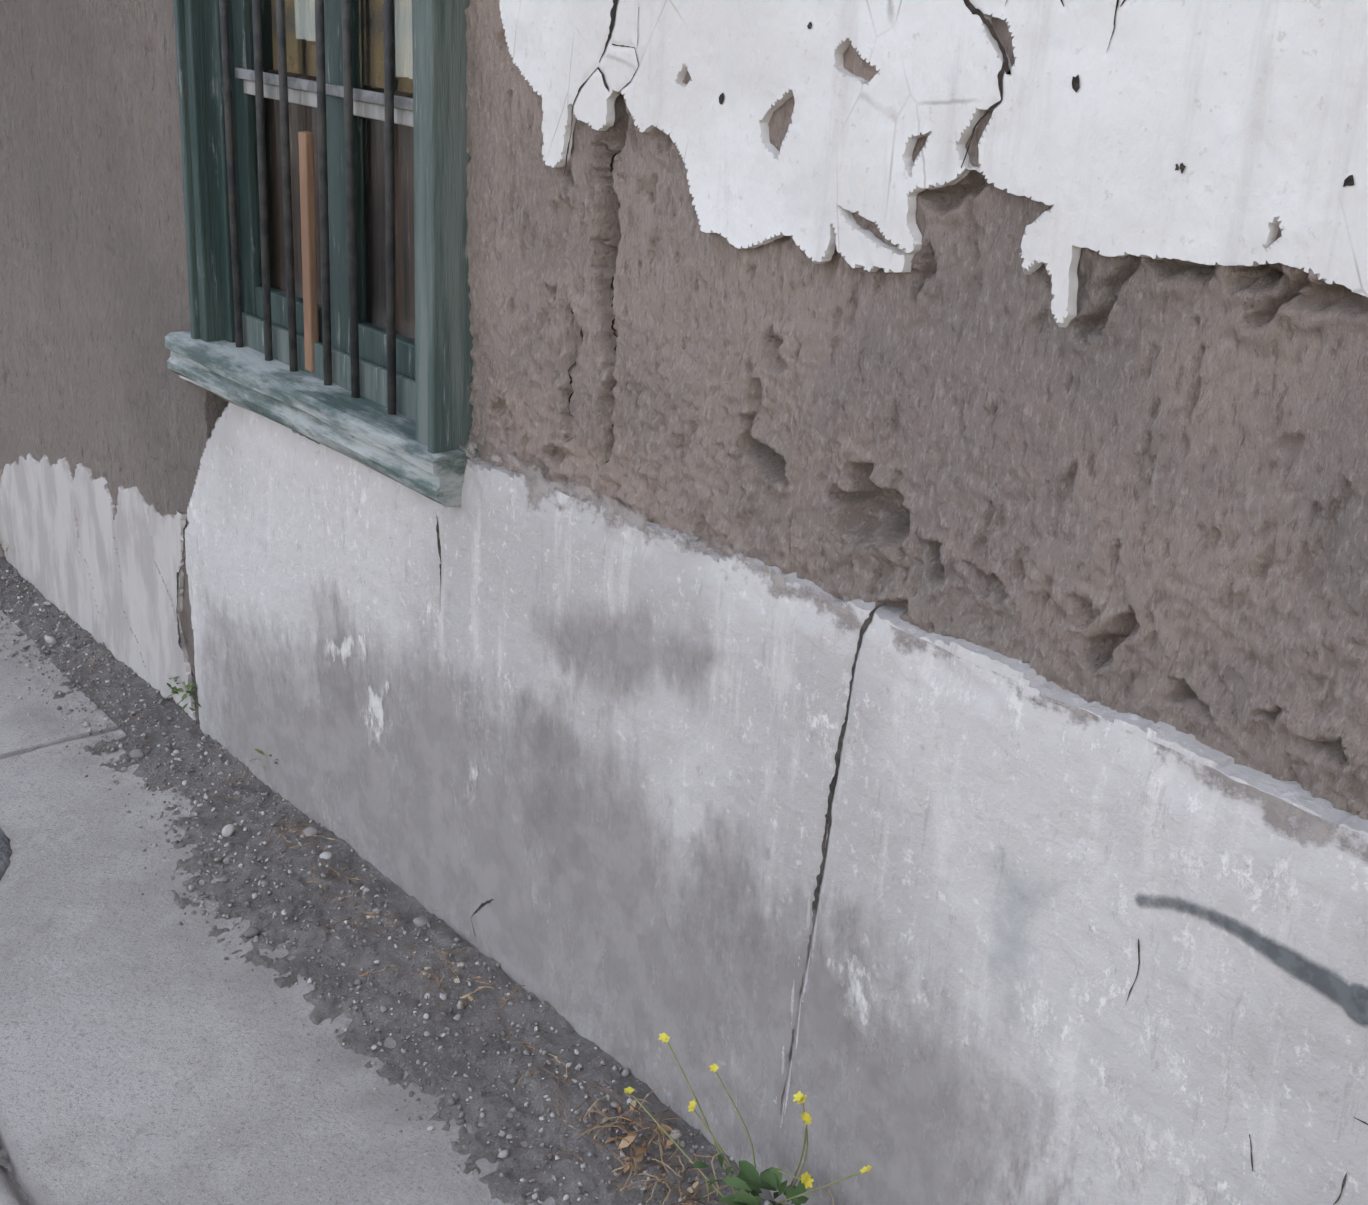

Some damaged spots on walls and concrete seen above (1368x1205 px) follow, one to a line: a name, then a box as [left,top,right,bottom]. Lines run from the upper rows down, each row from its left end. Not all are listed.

crack [564,0,639,174]
crack [961,0,1011,168]
crack [1106,0,1126,53]
spalling [460,0,1368,862]
peeling [0,453,198,721]
crack [176,522,197,724]
crack [799,601,885,996]
crack [780,1028,794,1115]